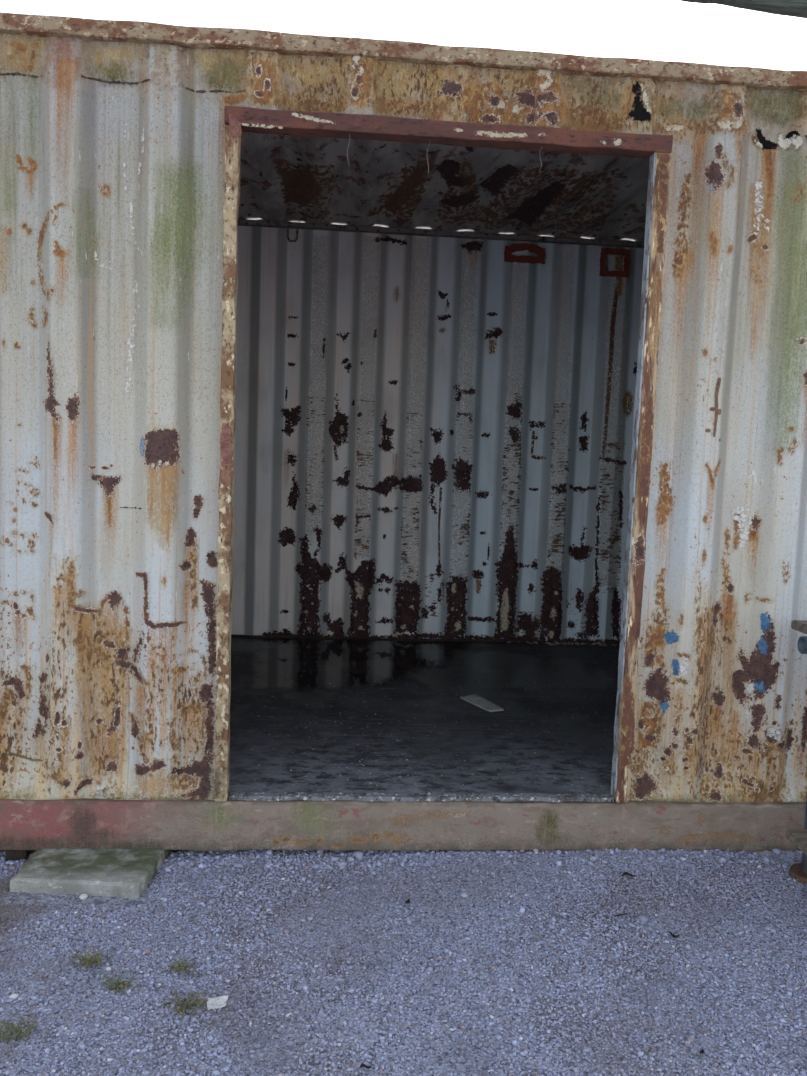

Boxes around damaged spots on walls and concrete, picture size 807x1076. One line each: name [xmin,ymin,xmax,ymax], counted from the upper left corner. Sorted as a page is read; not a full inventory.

corrosion [224,51,705,301]
peeling [640,83,763,207]
peeling [777,134,807,151]
peeling [708,229,718,256]
peeling [484,312,503,354]
peeling [277,393,625,646]
corrosion [623,392,675,534]
corrosion [705,460,721,500]
corrosion [1,591,35,627]
corrosion [0,666,36,793]
corrosion [44,557,132,780]
corrosion [620,528,807,802]